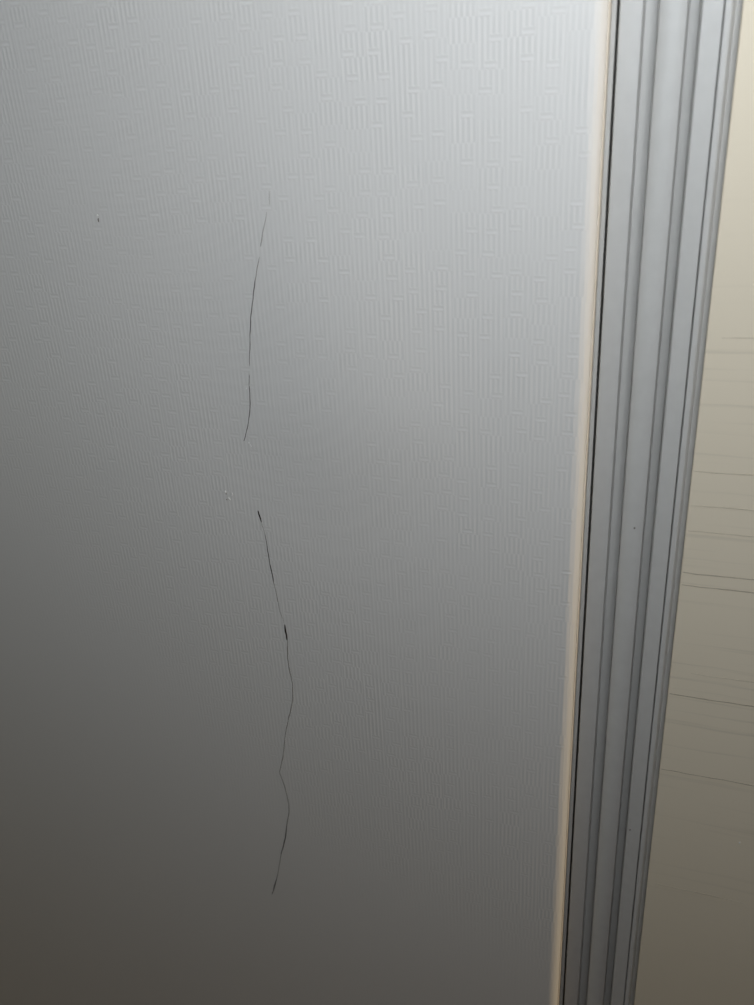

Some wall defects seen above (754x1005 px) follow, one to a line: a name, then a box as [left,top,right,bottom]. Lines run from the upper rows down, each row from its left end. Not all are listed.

crack [244,191,270,440]
crack [258,511,293,894]